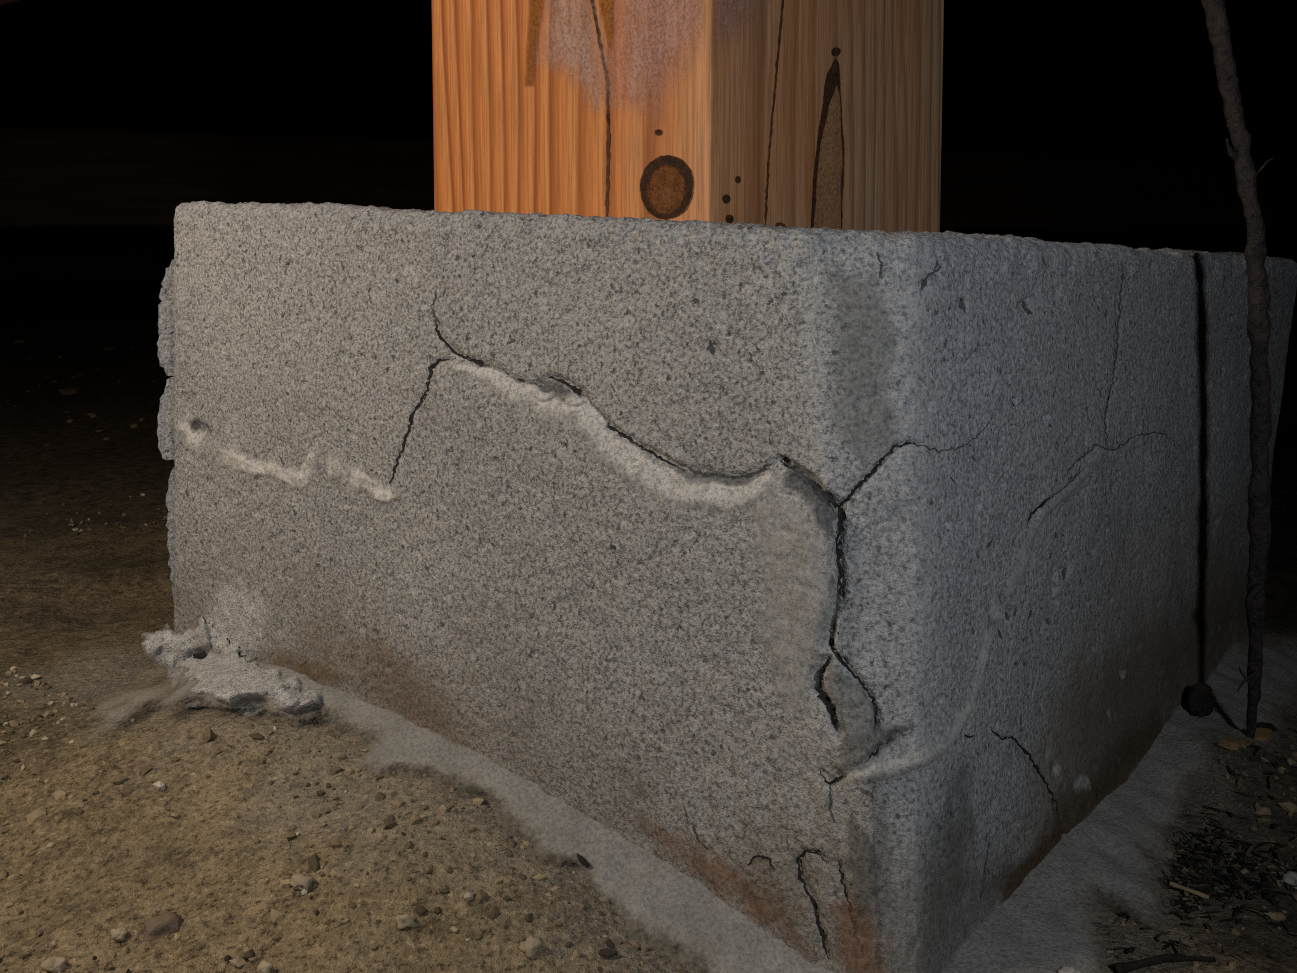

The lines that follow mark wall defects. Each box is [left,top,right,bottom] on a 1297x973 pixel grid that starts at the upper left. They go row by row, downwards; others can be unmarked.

water stain [526,0,703,97]
crack [389,291,585,486]
crack [1028,264,1174,522]
crack [606,417,993,823]
crack [965,727,1058,814]
crack [748,850,864,961]